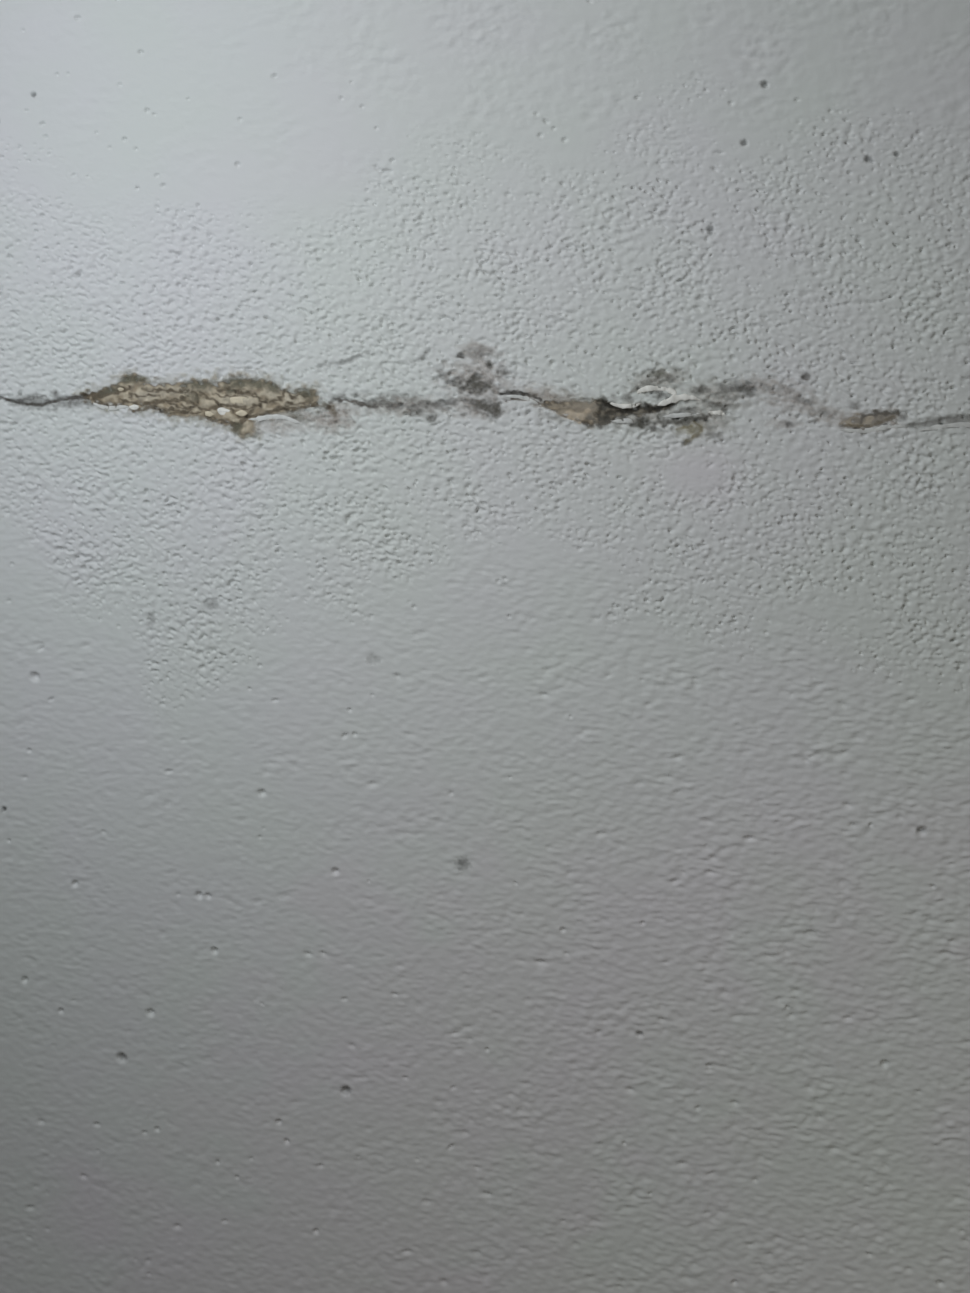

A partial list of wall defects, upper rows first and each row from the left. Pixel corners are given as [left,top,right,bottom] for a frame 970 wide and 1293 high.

crack [3,392,85,406]
peeling [80,373,326,438]
crack [499,390,565,410]
flaking render [546,375,726,443]
crack [920,418,970,431]